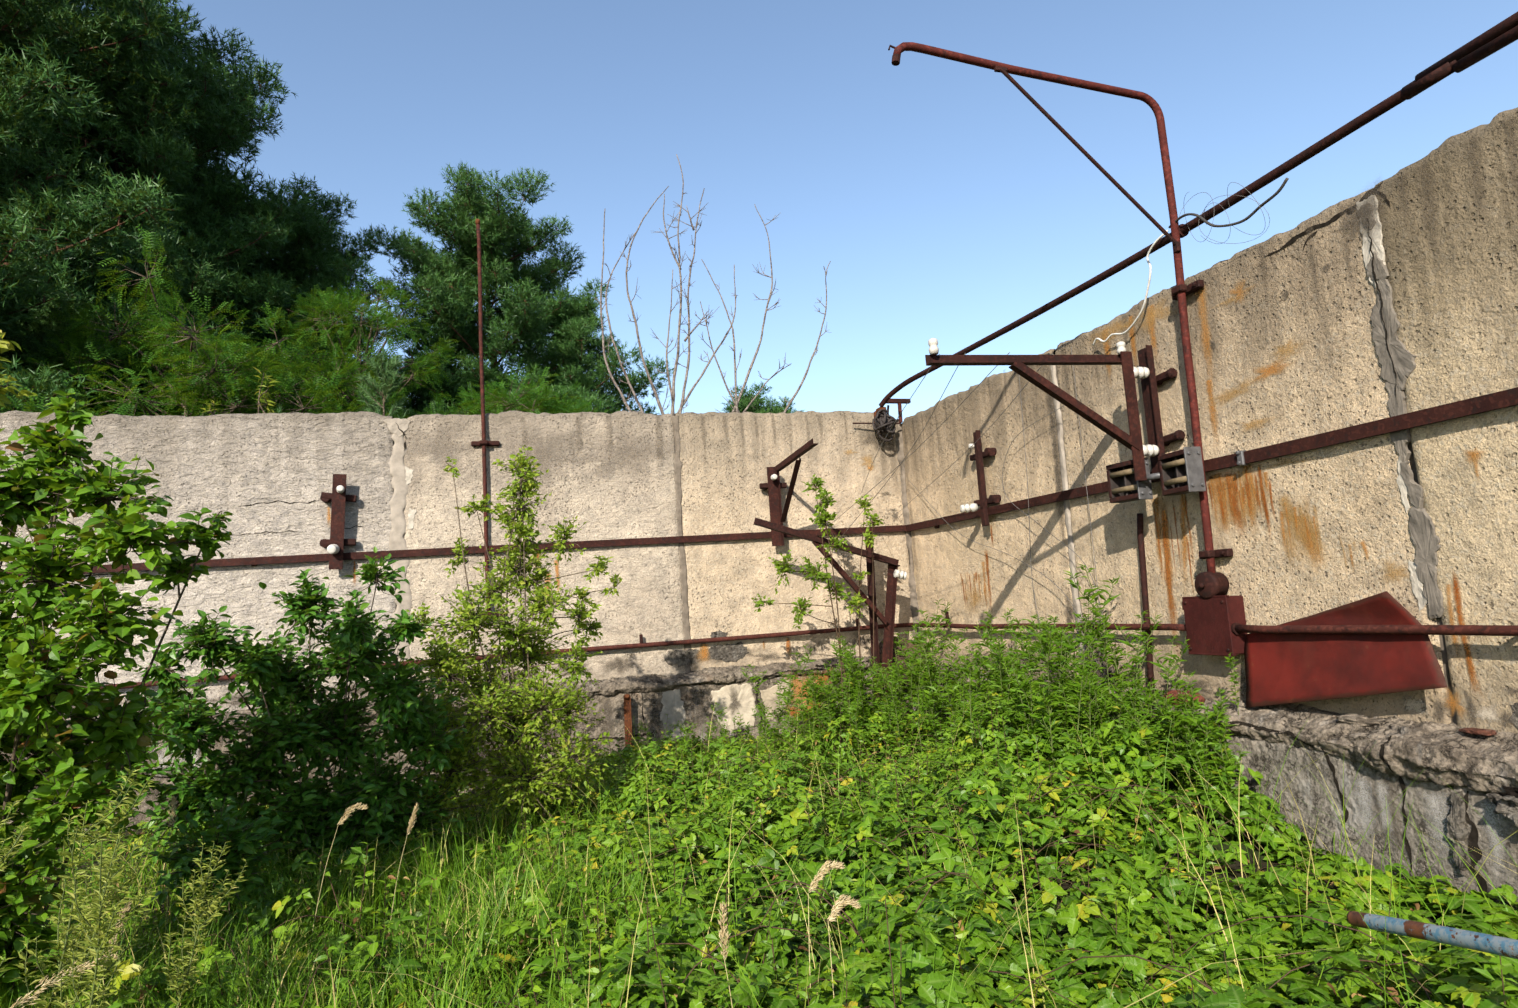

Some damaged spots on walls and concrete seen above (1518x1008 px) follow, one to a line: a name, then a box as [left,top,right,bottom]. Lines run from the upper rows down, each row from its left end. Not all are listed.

crack [1264,183,1390,257]
rust [1207,342,1295,429]
rust [1208,459,1321,555]
rust [961,526,993,606]
rust [1153,494,1192,636]
rust [1447,575,1475,681]
crack [1379,732,1412,872]
crack [1447,791,1487,893]